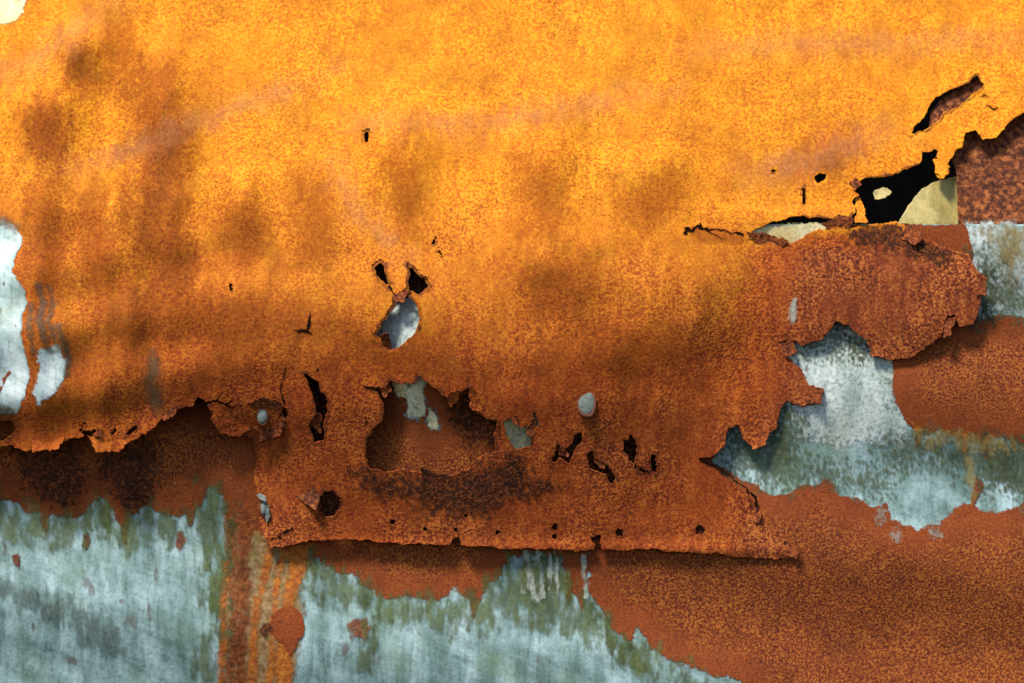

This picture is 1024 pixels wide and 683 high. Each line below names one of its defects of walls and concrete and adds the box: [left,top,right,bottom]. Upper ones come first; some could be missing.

peeling [0,218,71,415]
rust [374,263,388,284]
peeling [376,292,420,350]
rust [391,268,428,312]
peeling [746,163,919,247]
rust [843,223,974,268]
peeling [964,221,1024,319]
rust [303,369,328,442]
peeling [380,376,438,430]
peeling [779,322,926,451]
rust [892,314,1024,464]
rust [0,381,1024,683]